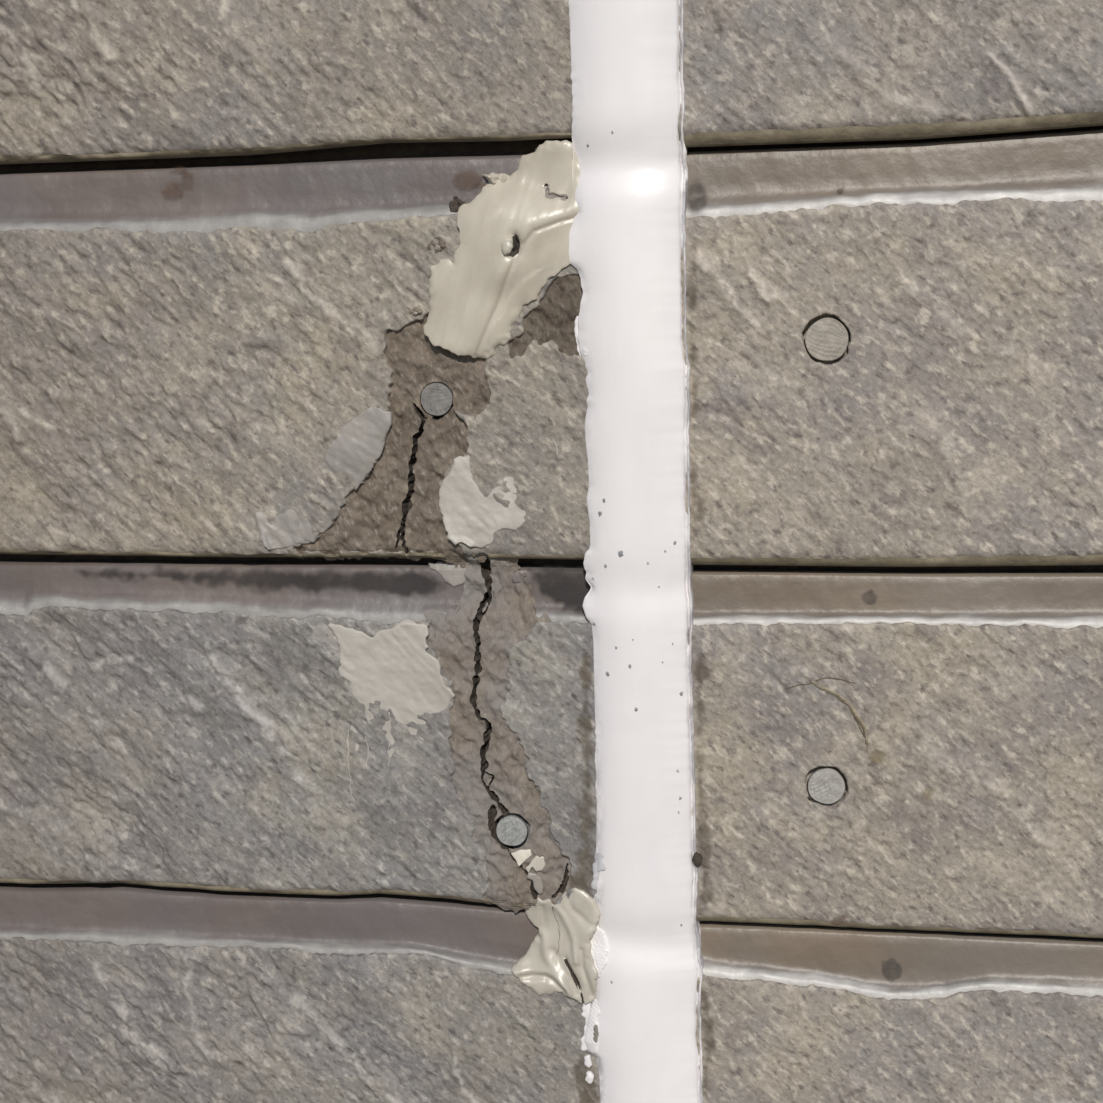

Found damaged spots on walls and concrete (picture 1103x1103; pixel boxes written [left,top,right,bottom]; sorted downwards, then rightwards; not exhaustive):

spalling [255,315,572,913]
crack [395,403,454,551]
crack [470,558,584,1003]
spalling [509,274,583,359]